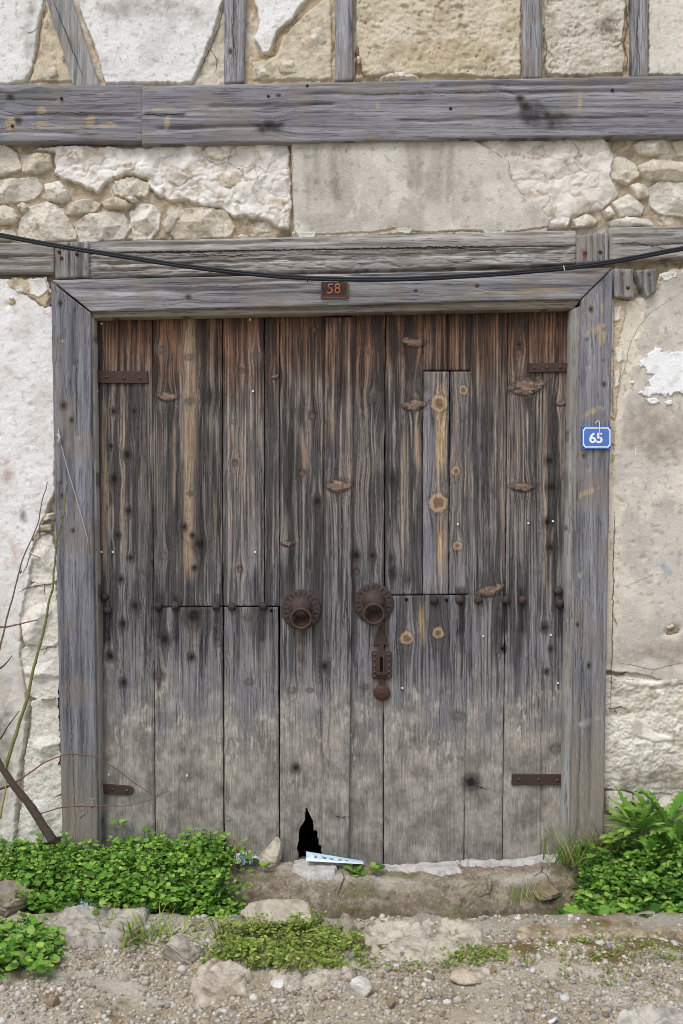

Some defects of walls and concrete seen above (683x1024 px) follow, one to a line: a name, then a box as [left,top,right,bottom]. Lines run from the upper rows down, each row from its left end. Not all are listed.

peeling [7,277,51,308]
peeling [611,268,683,470]
spalling [15,512,62,844]